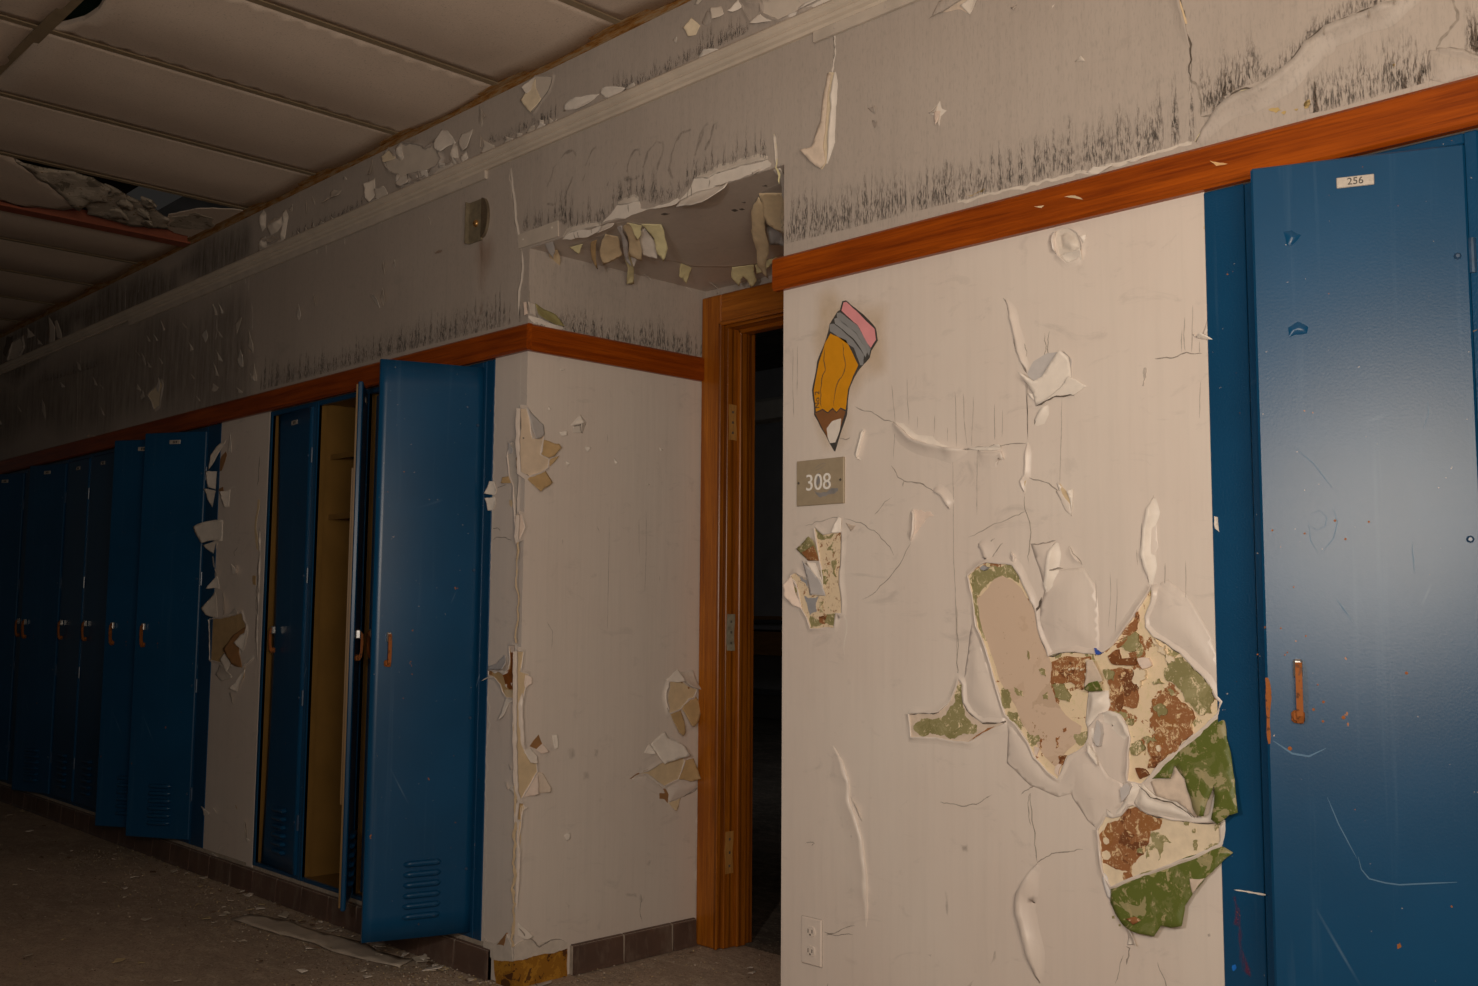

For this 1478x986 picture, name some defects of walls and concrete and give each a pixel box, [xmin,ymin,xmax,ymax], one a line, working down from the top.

peeling [363,72,635,203]
peeling [548,154,784,294]
leakage [781,81,1231,239]
peeling [1047,223,1088,270]
crack [1167,0,1478,146]
crack [1003,298,1049,373]
peeling [484,391,562,580]
peeling [783,509,934,635]
crack [875,467,1023,563]
peeling [856,407,1225,983]
crack [942,786,1034,824]
crack [1138,785,1192,817]